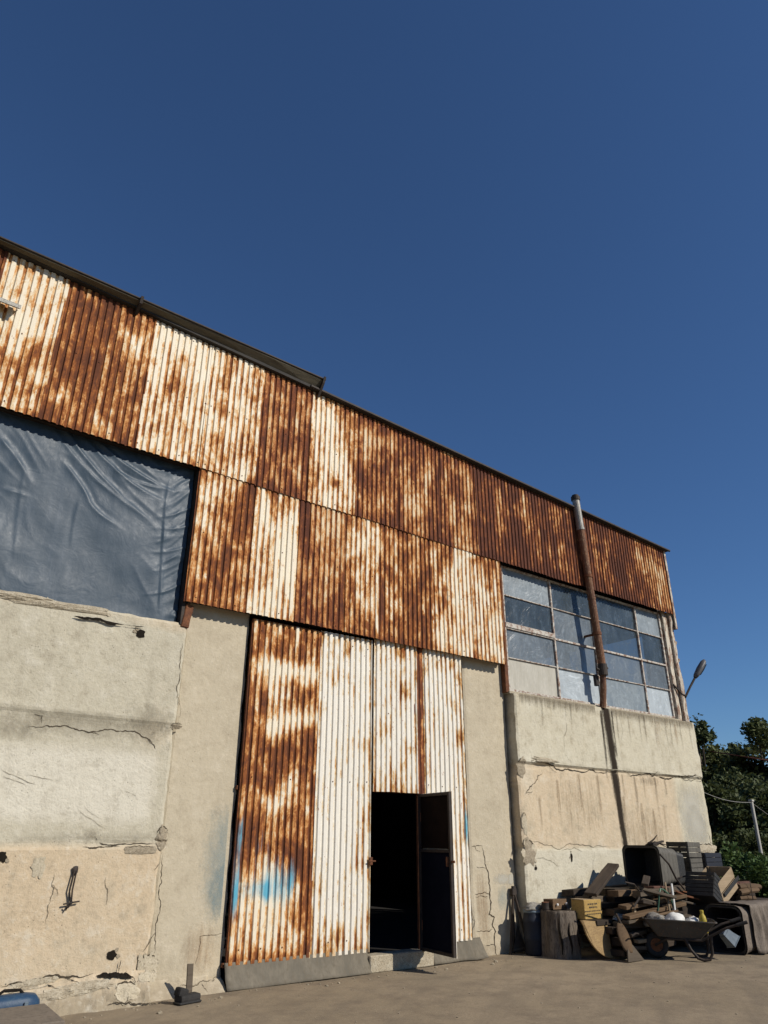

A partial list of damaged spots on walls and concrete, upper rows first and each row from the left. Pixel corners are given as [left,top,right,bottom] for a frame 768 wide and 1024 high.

spalling [0,590,111,616]
crack [29,714,155,748]
crack [527,723,705,793]
spalling [521,812,537,866]
crack [2,809,163,1005]
crack [472,845,497,955]
spalling [5,950,162,1005]